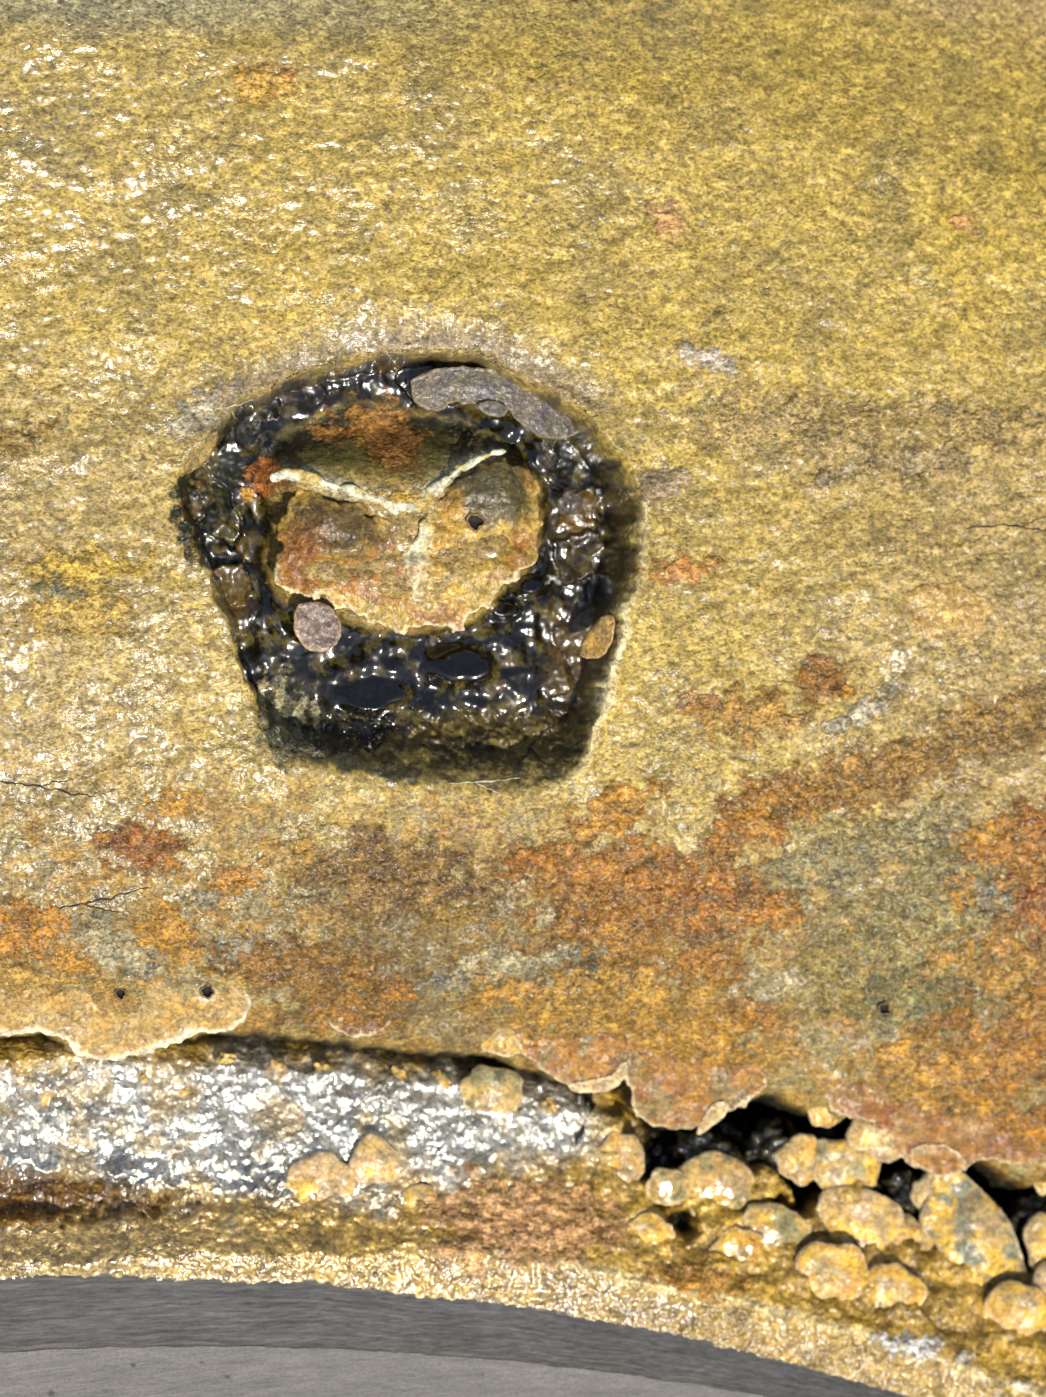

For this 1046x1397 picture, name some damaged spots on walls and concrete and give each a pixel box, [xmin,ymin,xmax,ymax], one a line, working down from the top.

damp [158,374,251,446]
peeling [410,365,580,439]
peeling [185,431,218,474]
corrosion [240,456,290,504]
corrosion [307,387,436,515]
peeling [273,458,543,653]
corrosion [639,551,725,589]
peeling [579,614,616,659]
damp [249,668,326,776]
corrosion [668,653,858,751]
corrosion [0,678,1046,1397]